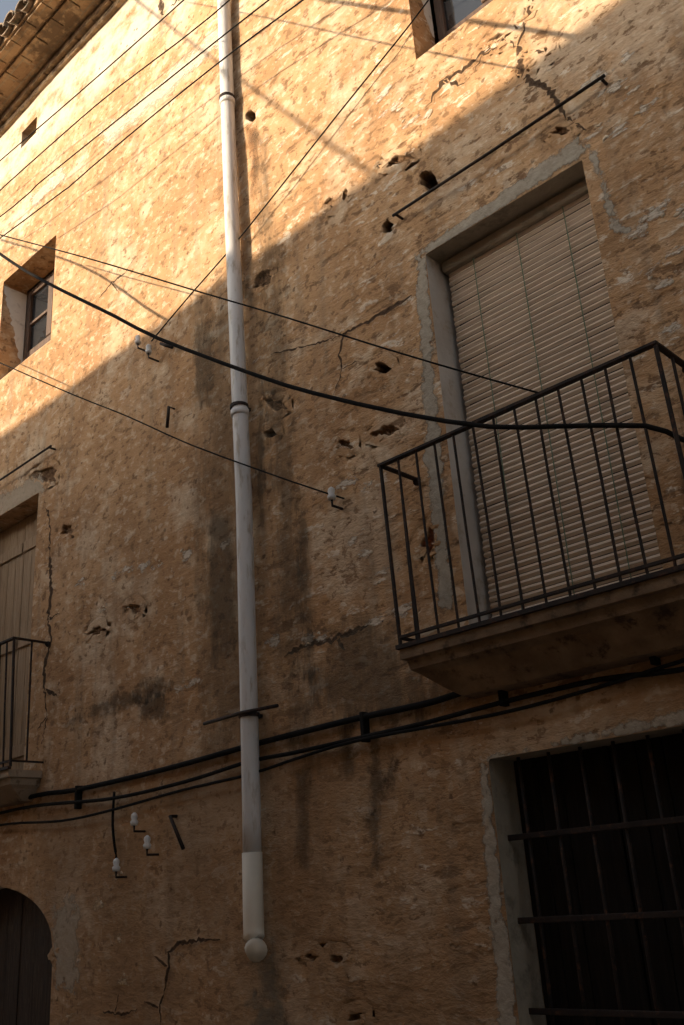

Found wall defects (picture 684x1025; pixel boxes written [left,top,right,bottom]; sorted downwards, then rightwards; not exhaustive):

crack [425,0,588,134]
crack [37,499,60,744]
crack [103,935,220,1025]